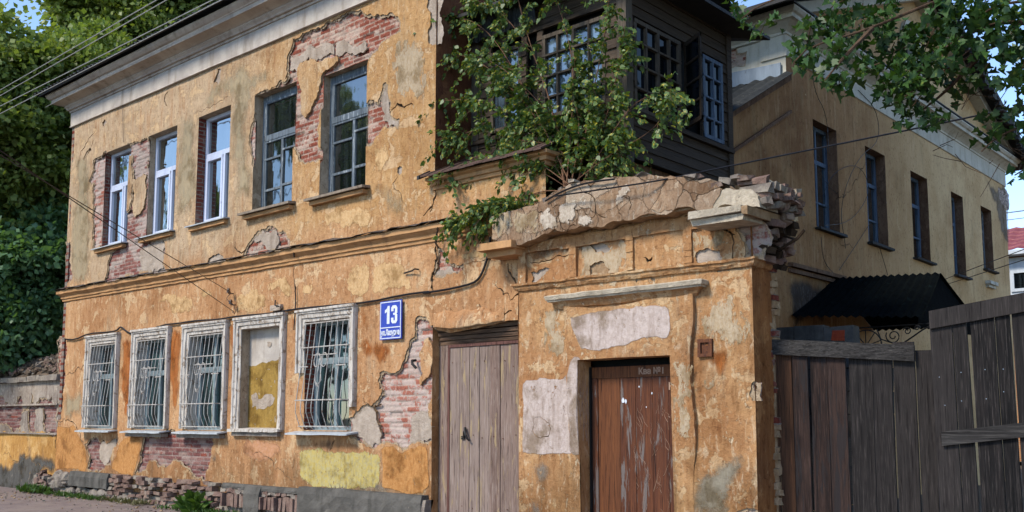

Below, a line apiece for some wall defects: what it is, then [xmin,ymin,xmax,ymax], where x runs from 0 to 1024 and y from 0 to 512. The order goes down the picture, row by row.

flaking render [256,0,444,175]
flaking render [83,138,167,283]
flaking render [243,225,291,257]
peeling [324,206,371,228]
flaking render [531,267,549,282]
crack [468,186,632,315]
peeling [580,240,626,286]
flaking render [347,316,439,451]
spalling [49,429,297,512]